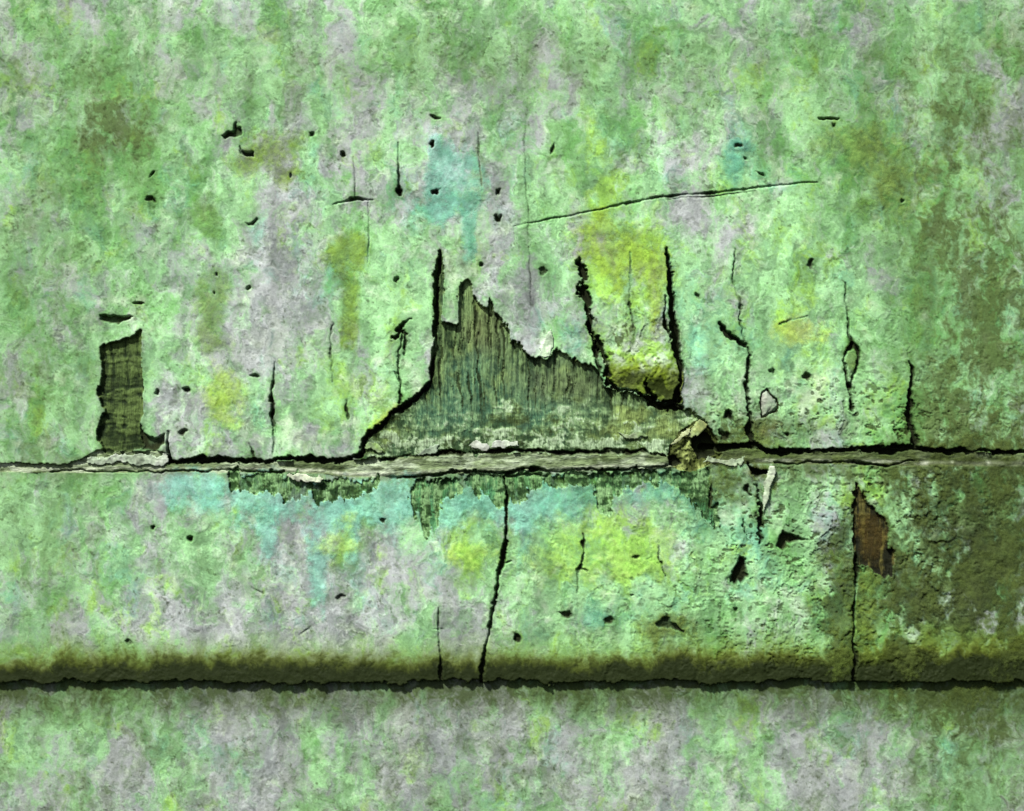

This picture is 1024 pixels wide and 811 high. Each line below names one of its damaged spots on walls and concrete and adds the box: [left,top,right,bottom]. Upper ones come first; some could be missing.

crack [514,125,817,305]
peeling [87,329,169,467]
peeling [228,251,776,539]
crack [575,248,684,412]
crack [697,249,1024,543]
crack [52,363,668,683]
crack [851,555,859,681]
peeling [851,483,896,578]